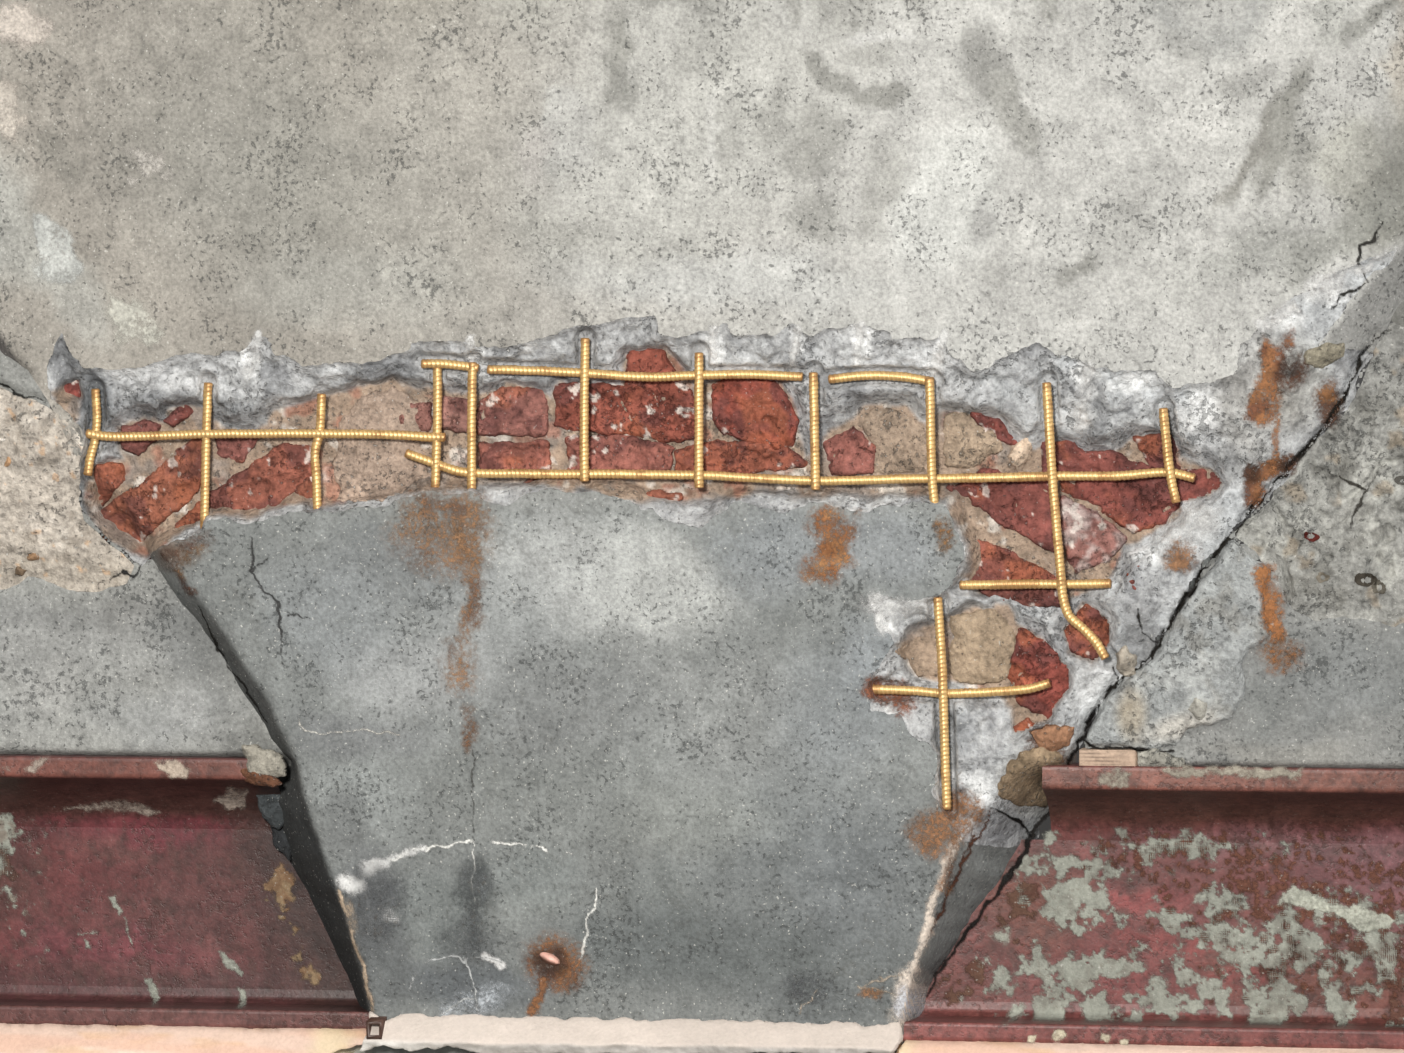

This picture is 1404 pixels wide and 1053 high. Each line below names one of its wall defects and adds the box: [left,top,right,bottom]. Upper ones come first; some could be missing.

rust [1243,334,1309,507]
crack [249,538,310,664]
spalling [47,250,1404,1026]
rust [800,505,855,581]
crack [1067,330,1391,765]
rust [1252,564,1299,671]
peeling [28,758,47,772]
peeling [0,813,26,936]
rust [526,934,585,1017]
crack [580,888,597,959]
crack [857,808,1050,997]
peeling [1053,1030,1066,1041]